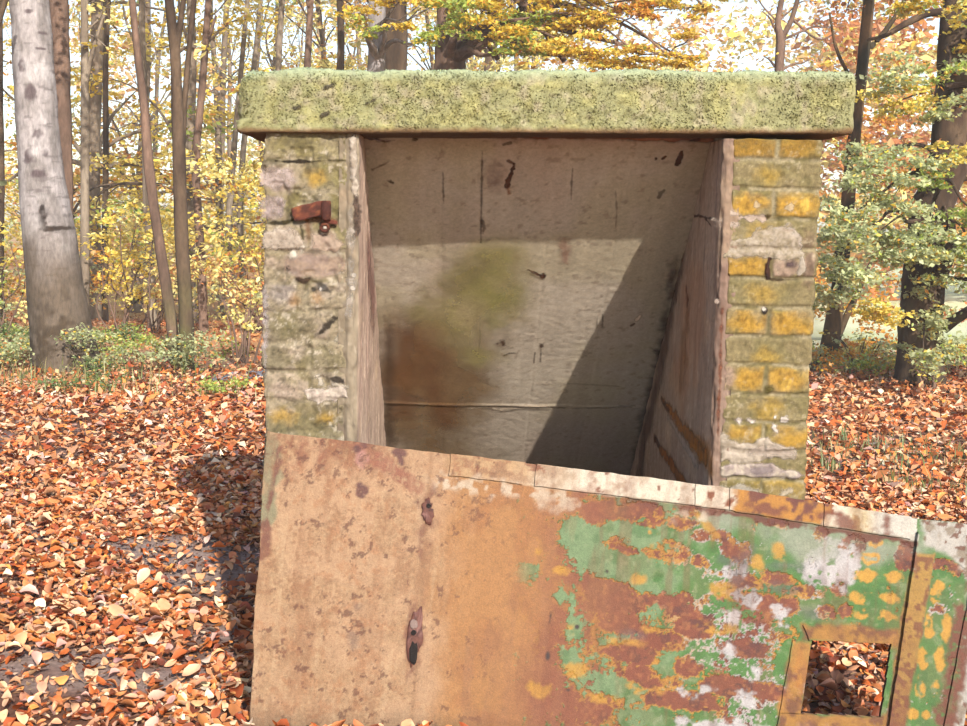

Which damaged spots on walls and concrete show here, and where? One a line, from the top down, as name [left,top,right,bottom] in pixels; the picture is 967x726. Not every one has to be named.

leakage [381,315,563,455]
corrosion [654,435,687,483]
corrosion [661,396,712,473]